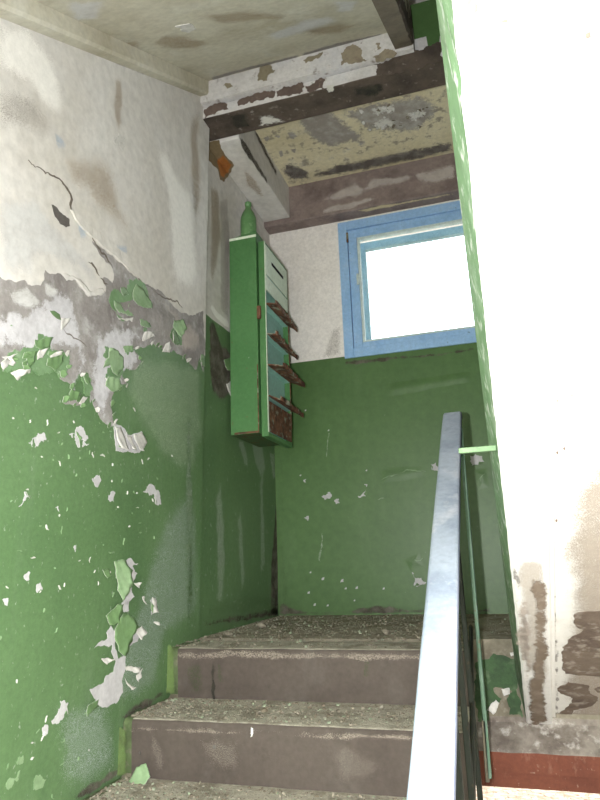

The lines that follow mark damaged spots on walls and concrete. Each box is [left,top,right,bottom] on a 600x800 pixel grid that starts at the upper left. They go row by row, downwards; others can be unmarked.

peeling [204,102,228,118]
rust [209,140,234,182]
peeling [257,65,275,81]
peeling [258,115,283,127]
peeling [237,78,335,106]
leakage [229,113,453,198]
peeling [341,42,443,76]
crack [28,160,182,307]
peeling [0,241,205,453]
leakage [515,463,600,725]
peeling [86,558,160,717]
peeling [474,579,550,725]